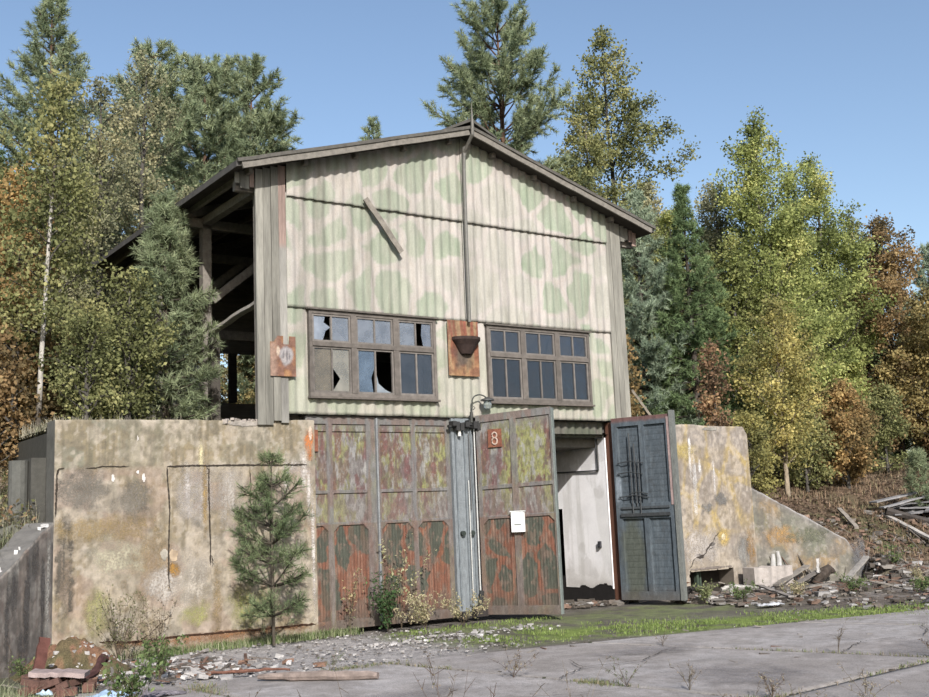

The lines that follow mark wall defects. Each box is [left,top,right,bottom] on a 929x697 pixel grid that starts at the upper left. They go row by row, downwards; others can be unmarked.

damp [57,470,108,508]
damp [4,482,179,662]
damp [199,444,207,522]
damp [284,455,316,594]
crack [687,534,718,583]
damp [680,439,727,513]